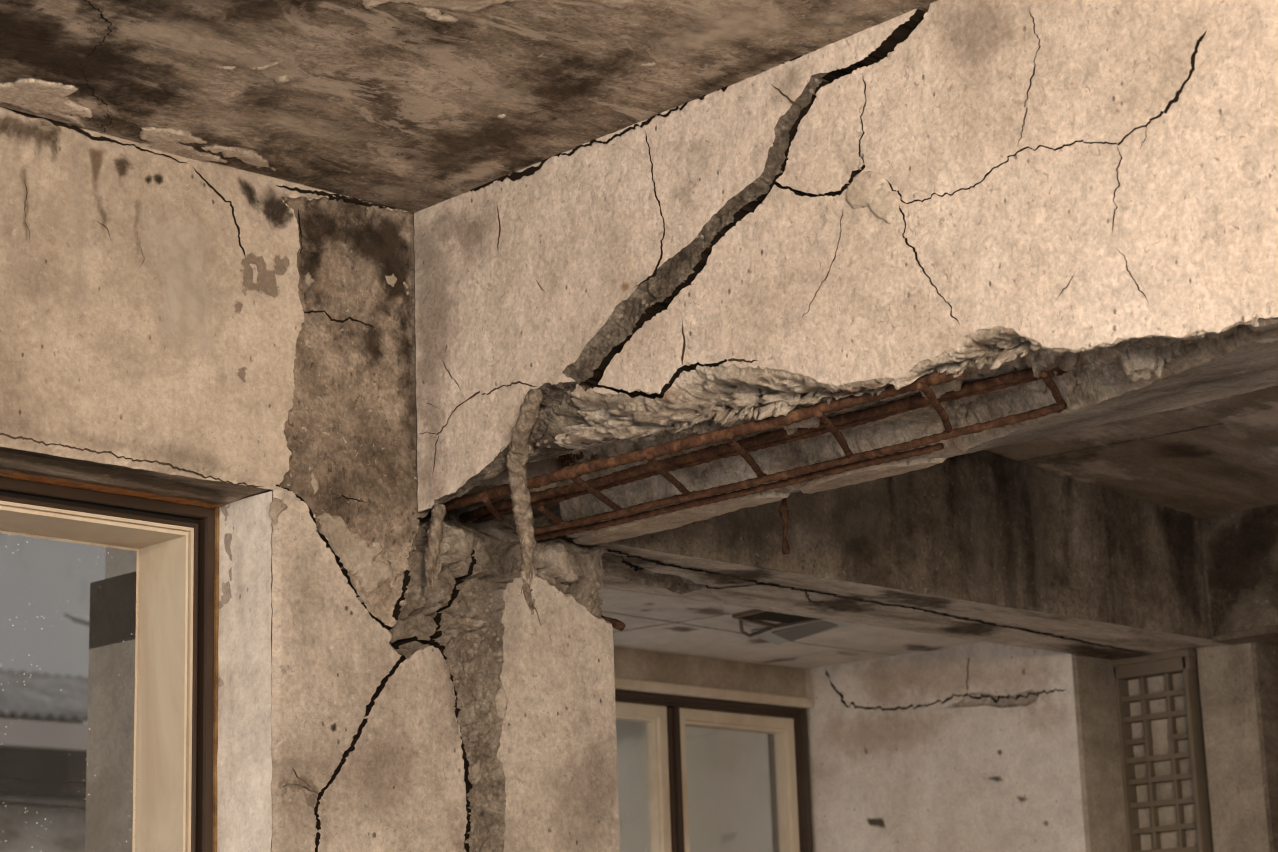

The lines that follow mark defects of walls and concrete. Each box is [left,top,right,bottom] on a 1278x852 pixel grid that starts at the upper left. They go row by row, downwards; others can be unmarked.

leakage [0,0,178,138]
flaking render [215,58,291,85]
leakage [687,47,811,102]
crack [3,81,246,258]
leakage [179,91,413,389]
crack [276,185,397,256]
crack [417,8,1225,519]
rust [547,435,641,467]
spalling [235,196,1278,852]
leakage [720,491,813,529]
crack [0,433,476,852]
crack [602,549,1138,652]